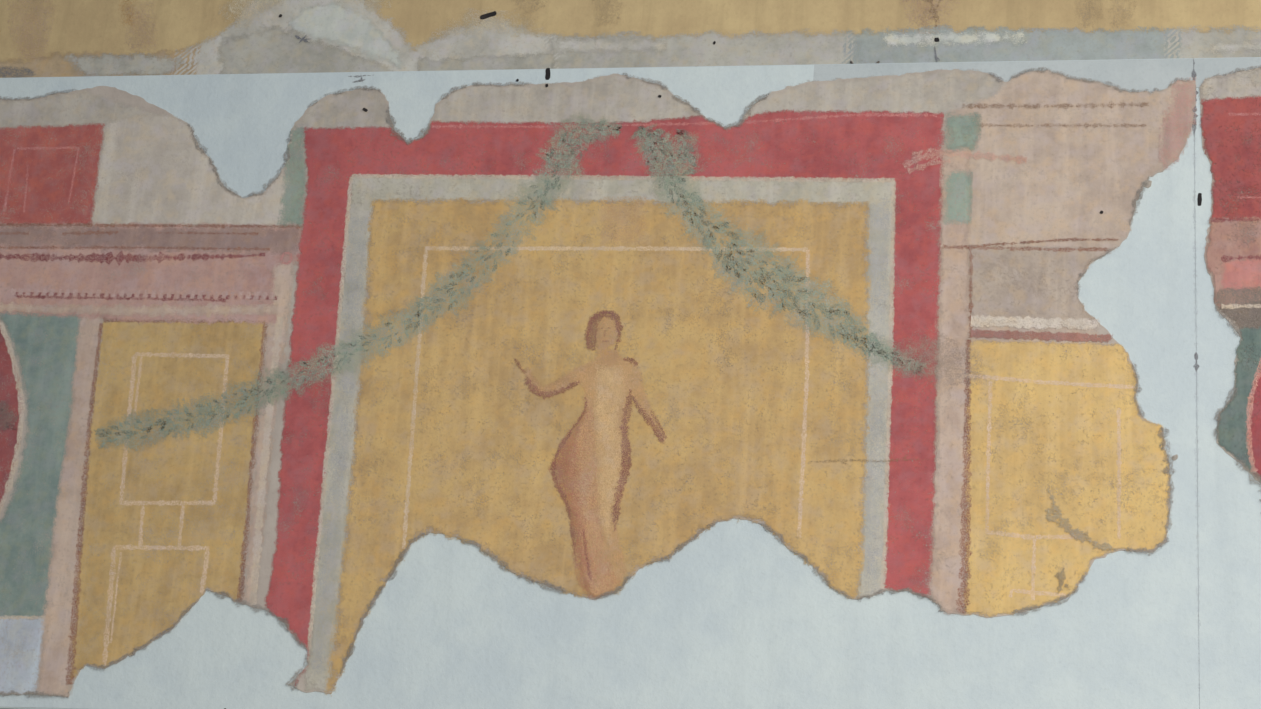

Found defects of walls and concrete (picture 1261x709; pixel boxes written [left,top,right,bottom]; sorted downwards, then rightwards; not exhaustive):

flaking render [0,0,1261,198]